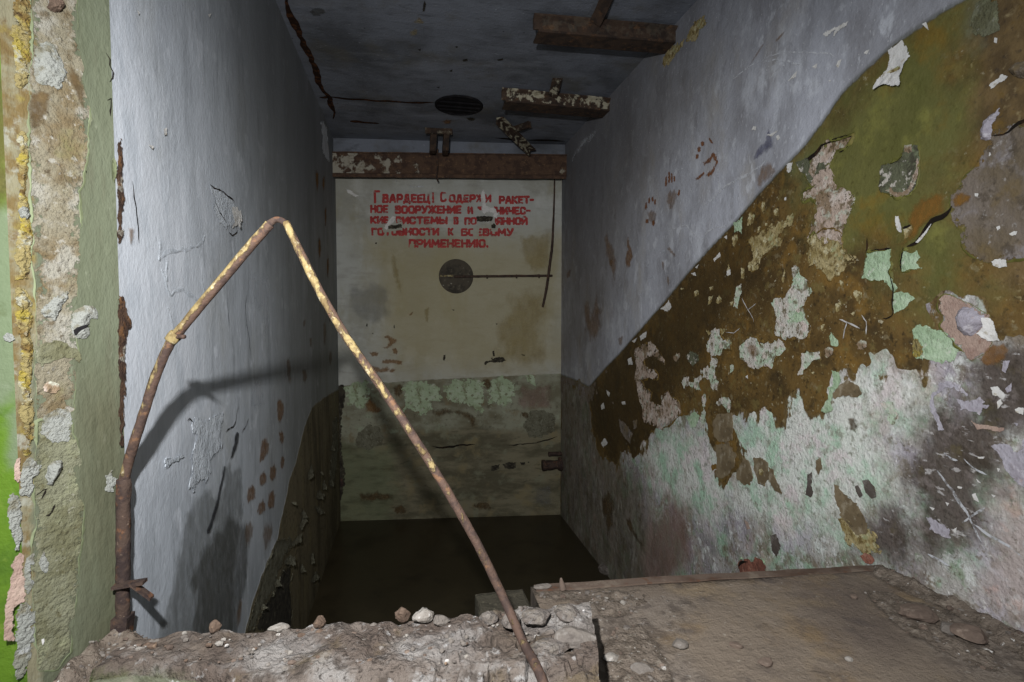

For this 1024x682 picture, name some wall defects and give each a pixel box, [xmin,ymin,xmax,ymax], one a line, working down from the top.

crack [285,0,435,124]
peeling [662,15,707,68]
peeling [873,40,910,89]
peeling [969,0,1000,43]
rust [116,138,125,244]
flaking render [209,184,242,229]
peeling [3,0,98,672]
rust [117,296,132,447]
peeling [523,124,1024,632]
peeling [164,412,223,493]
rust [247,400,285,514]
flaking render [247,380,373,632]